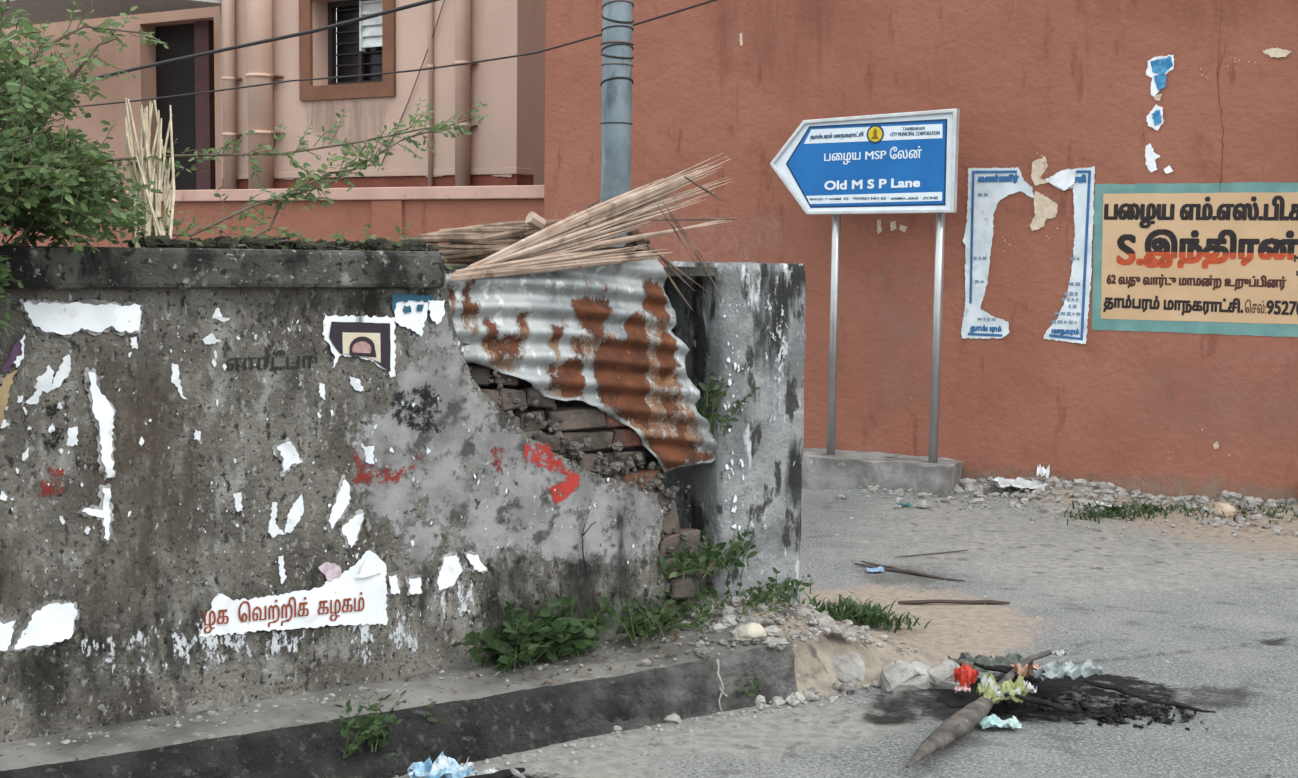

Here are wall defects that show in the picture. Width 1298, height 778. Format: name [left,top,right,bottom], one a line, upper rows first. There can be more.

leakage [347,296,390,322]
corrosion [447,279,531,371]
leakage [106,385,166,482]
peeling [317,371,334,418]
peeling [328,294,715,664]
corrosion [544,279,713,470]
leakage [156,604,204,664]
leakage [483,561,549,635]
leakage [561,519,649,619]